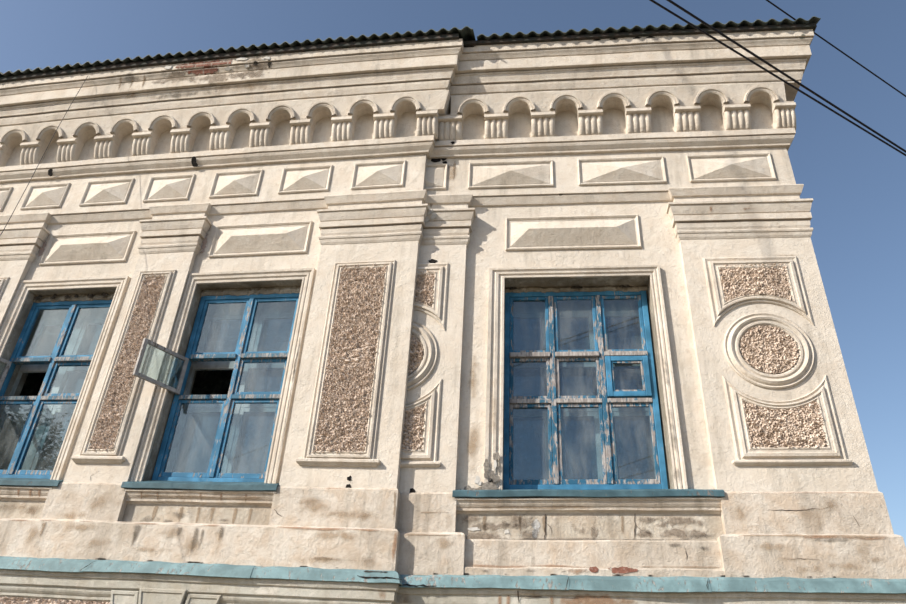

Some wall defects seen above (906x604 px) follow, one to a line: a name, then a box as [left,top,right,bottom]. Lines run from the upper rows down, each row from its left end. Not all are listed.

flaking render [154,56,271,83]
spalling [460,452,500,490]
leakage [132,506,158,551]
leakage [188,507,203,550]
spalling [638,517,706,538]
flaking render [589,566,638,576]